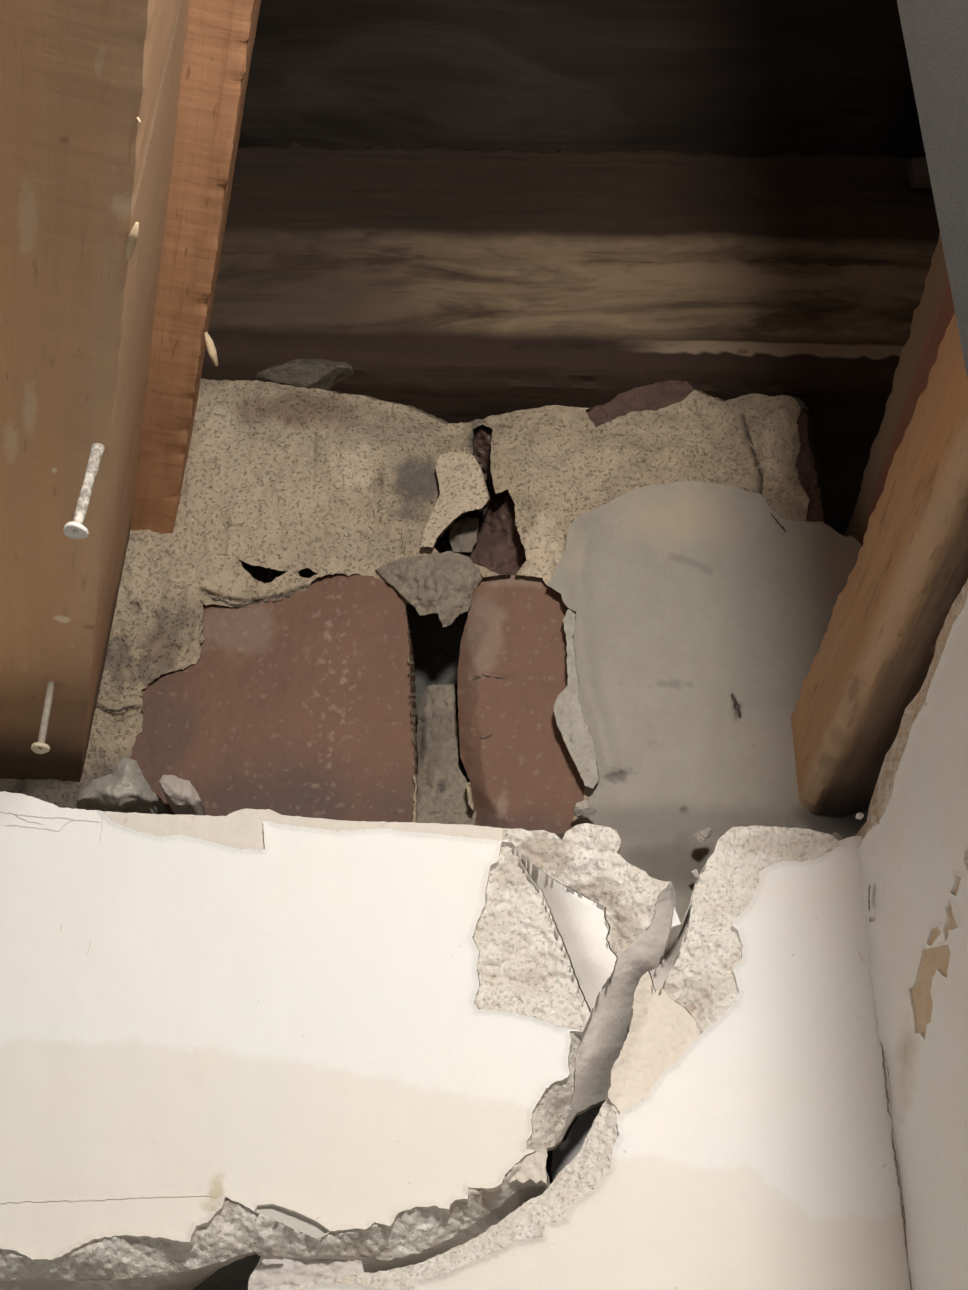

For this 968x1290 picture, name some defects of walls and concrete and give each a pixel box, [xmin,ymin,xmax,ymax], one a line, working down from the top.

crack [0,811,103,842]
spalling [103,481,968,1113]
crack [0,882,676,1290]